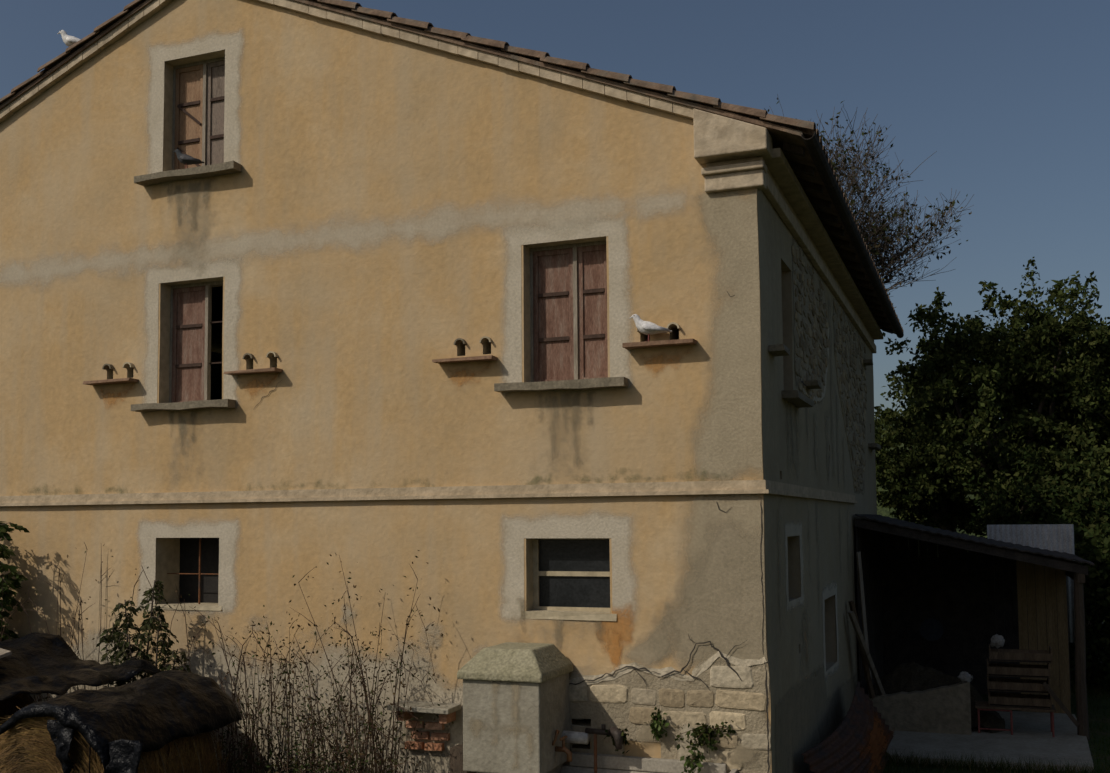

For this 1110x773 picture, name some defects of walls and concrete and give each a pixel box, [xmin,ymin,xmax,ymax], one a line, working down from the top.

flaking render [684,192,764,589]
peeling [180,645,463,773]
spalling [564,650,771,773]
crack [569,503,770,773]